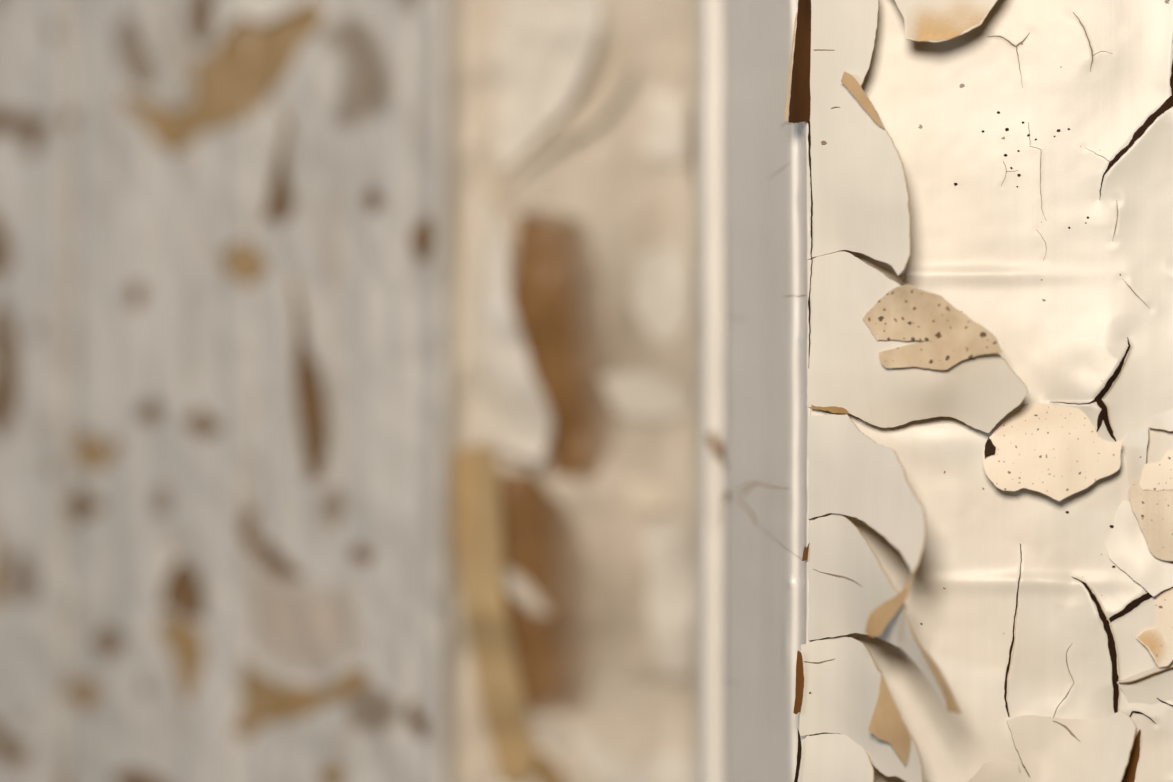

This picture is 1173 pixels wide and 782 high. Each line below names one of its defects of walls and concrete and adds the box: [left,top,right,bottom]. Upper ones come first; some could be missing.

crack [987,32,1030,88]
crack [1073,12,1113,71]
crack [1001,122,1046,258]
crack [1086,61,1173,241]
peeling [798,0,1173,782]
crack [1059,337,1132,442]
crack [1004,544,1022,717]
crack [1053,644,1078,740]
crack [1073,577,1173,723]